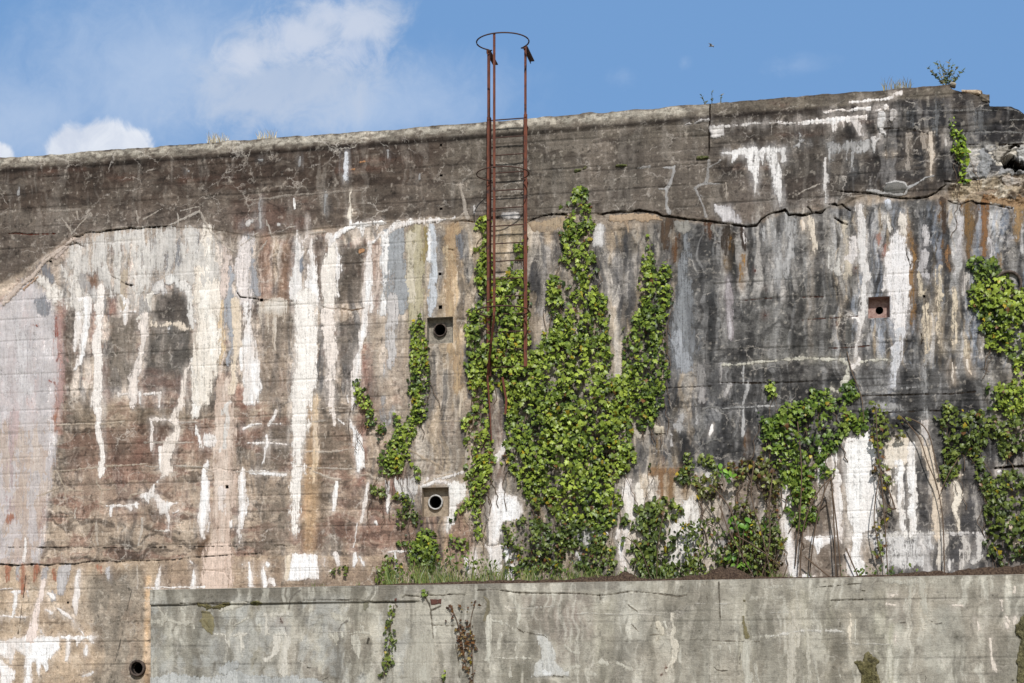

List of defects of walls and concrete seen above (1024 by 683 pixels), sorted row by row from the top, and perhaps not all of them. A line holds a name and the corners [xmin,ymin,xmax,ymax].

crack [597,143,1024,228]
spalling [951,144,1024,208]
crack [8,226,173,246]
damp [653,90,986,446]
damp [0,152,467,683]
damp [572,478,700,571]
damp [750,408,987,629]
damp [977,621,997,671]